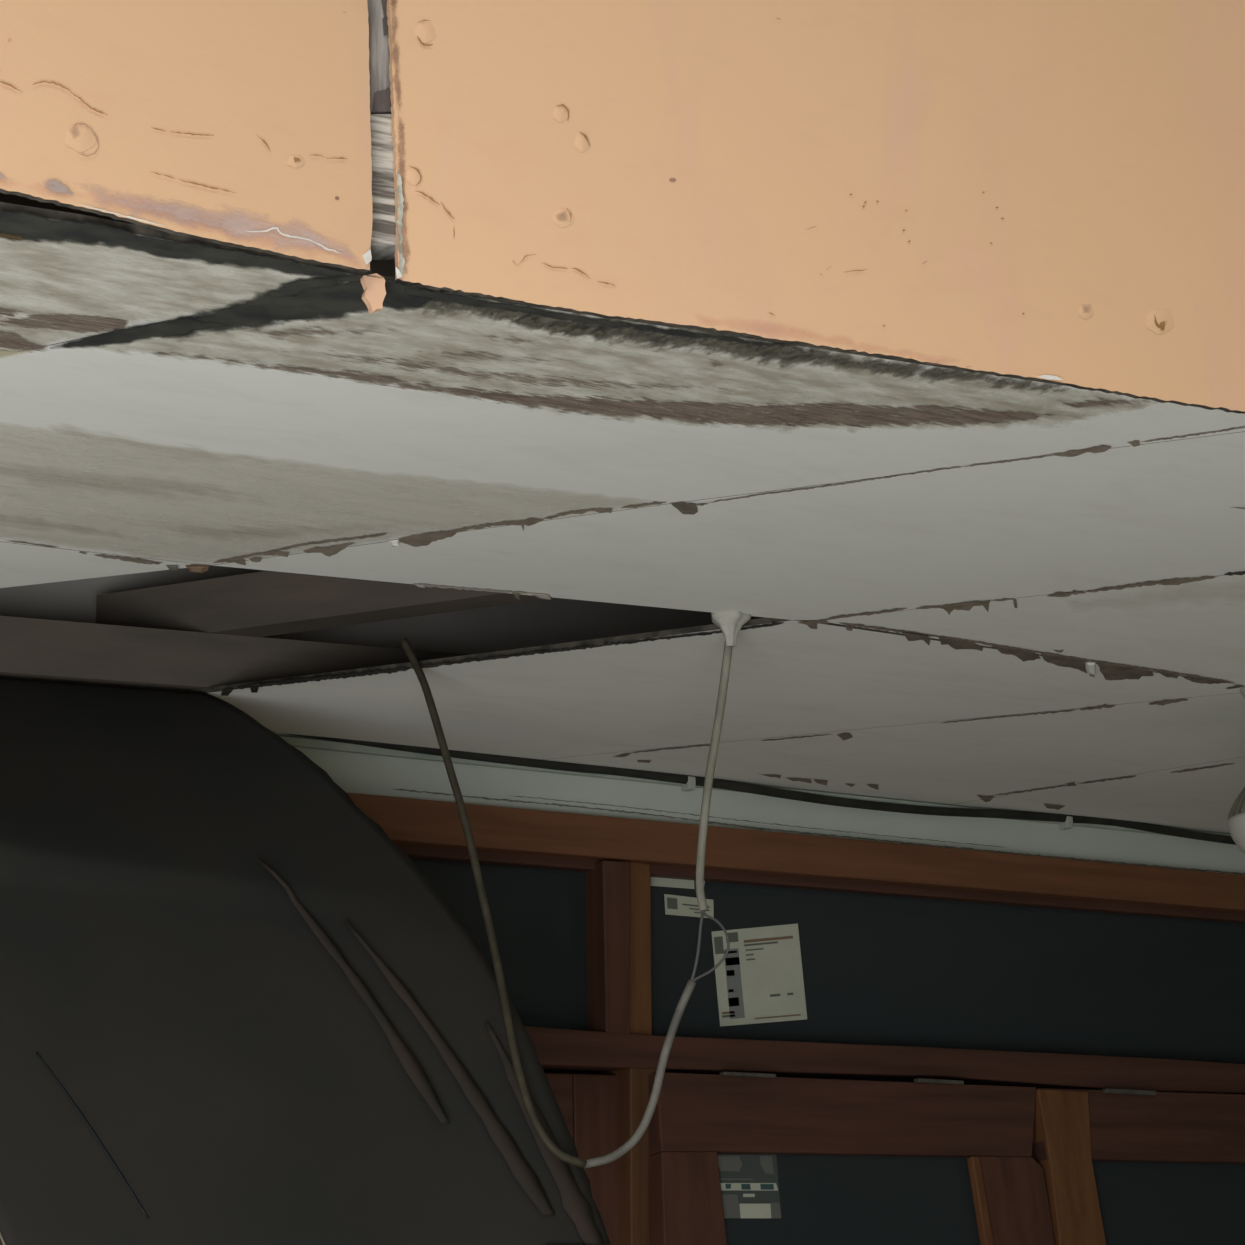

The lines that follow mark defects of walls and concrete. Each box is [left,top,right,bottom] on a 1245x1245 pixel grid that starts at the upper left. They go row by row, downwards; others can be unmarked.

peeling [45,180,345,254]
water stain [0,210,1147,430]
peeling [1127,426,1245,447]
flaking render [0,445,1111,624]
peeling [1048,571,1245,597]
flaking render [265,598,714,655]
peeling [798,598,1244,689]
peeling [945,704,1116,723]
peeling [615,745,710,763]
peeling [763,733,852,741]
peeling [761,774,828,786]
peeling [977,776,1136,810]